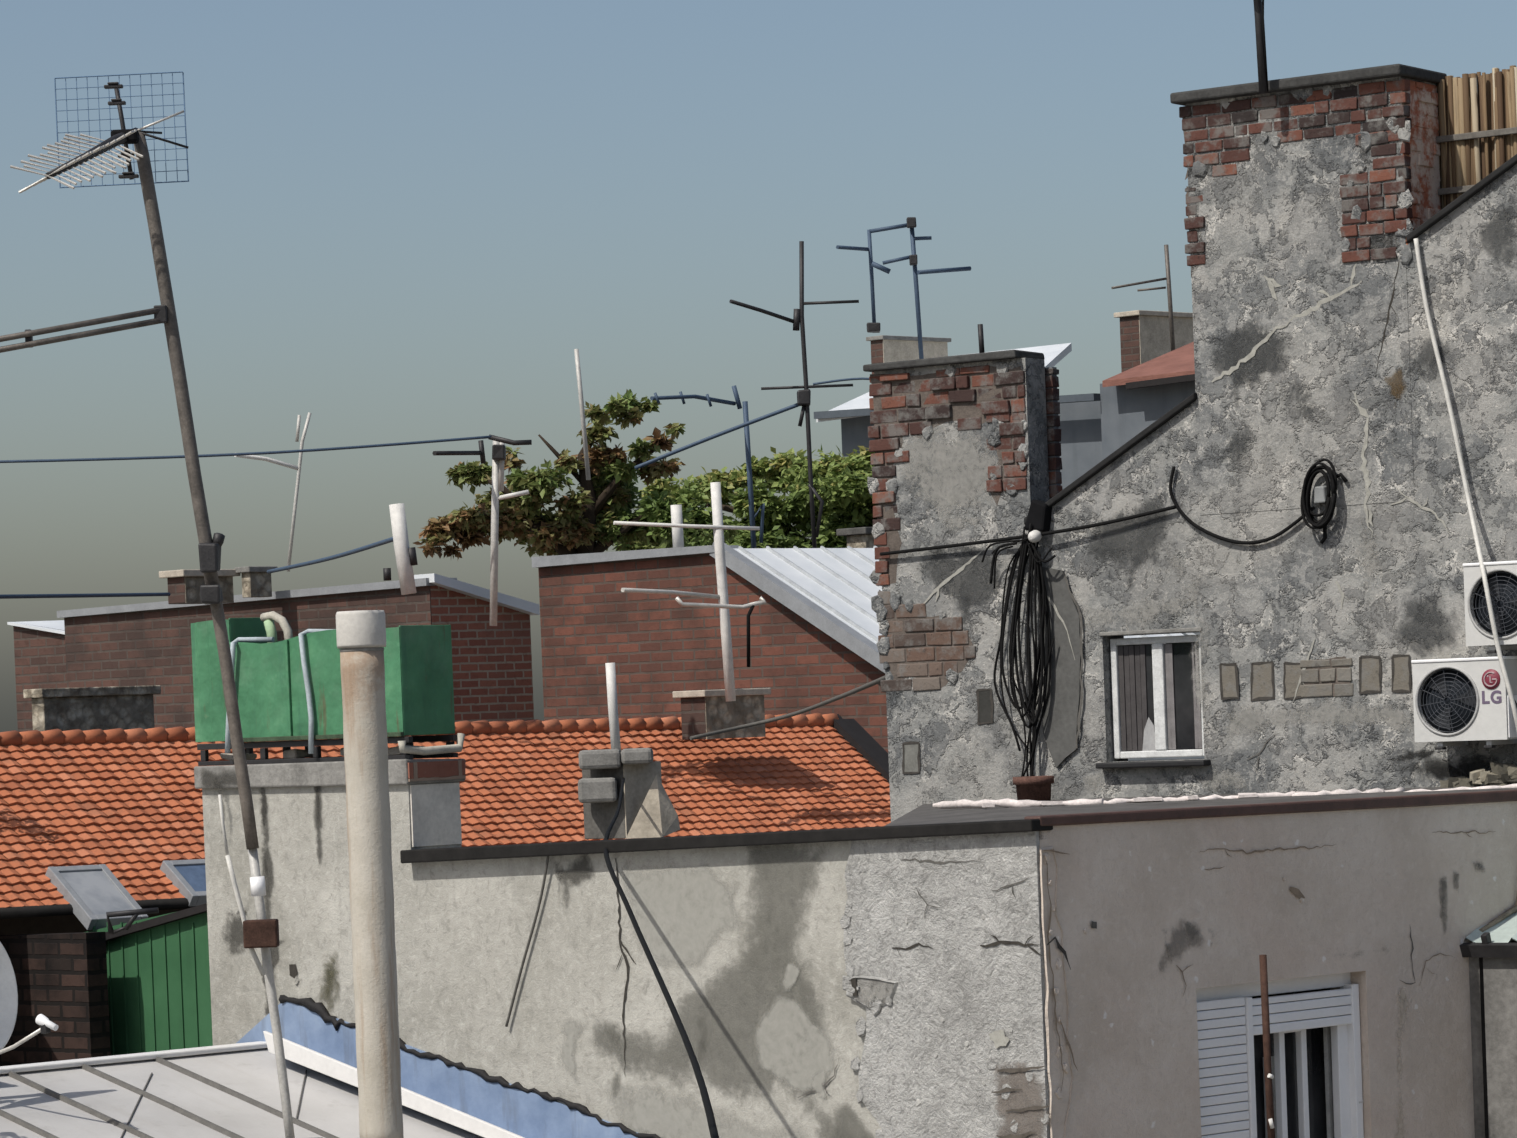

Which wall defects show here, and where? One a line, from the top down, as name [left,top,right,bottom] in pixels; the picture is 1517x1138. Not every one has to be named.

spalling [1179,77,1414,276]
spalling [867,362,1028,692]
spalling [976,689,994,725]
leakage [261,787,273,919]
leakage [262,941,280,1014]
leakage [556,856,592,894]
crack [615,858,636,1074]
leakage [595,845,820,1093]
crack [892,858,1029,955]
crack [980,935,1042,956]
crack [1200,845,1333,870]
leakage [821,1106,873,1138]